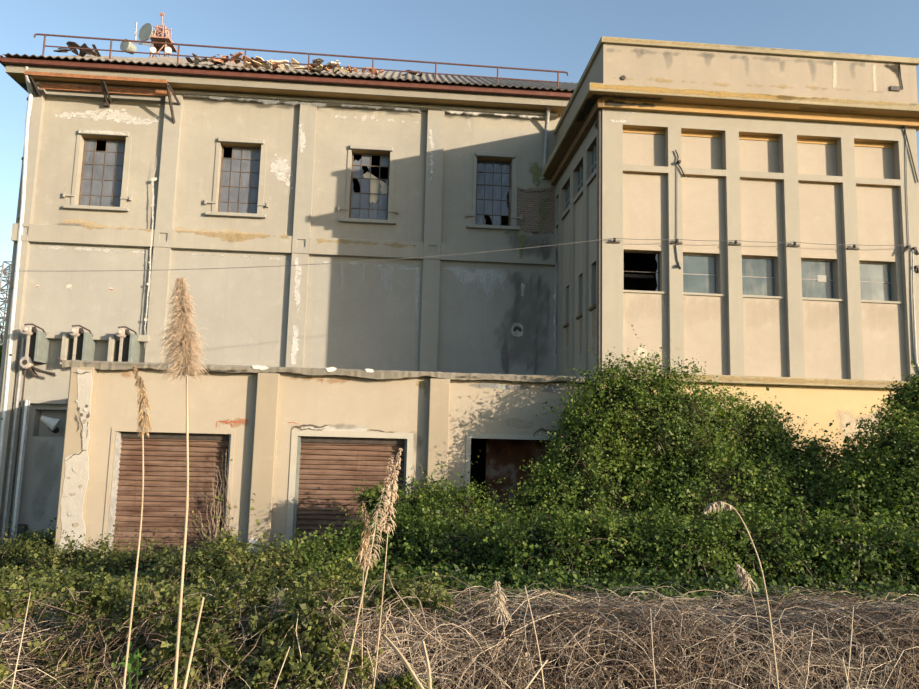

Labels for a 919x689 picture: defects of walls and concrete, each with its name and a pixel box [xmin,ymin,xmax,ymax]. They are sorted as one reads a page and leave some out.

damp [873,63,899,91]
peeling [270,154,293,193]
flaking render [509,184,555,234]
crack [458,415,500,426]
peeling [57,369,93,556]